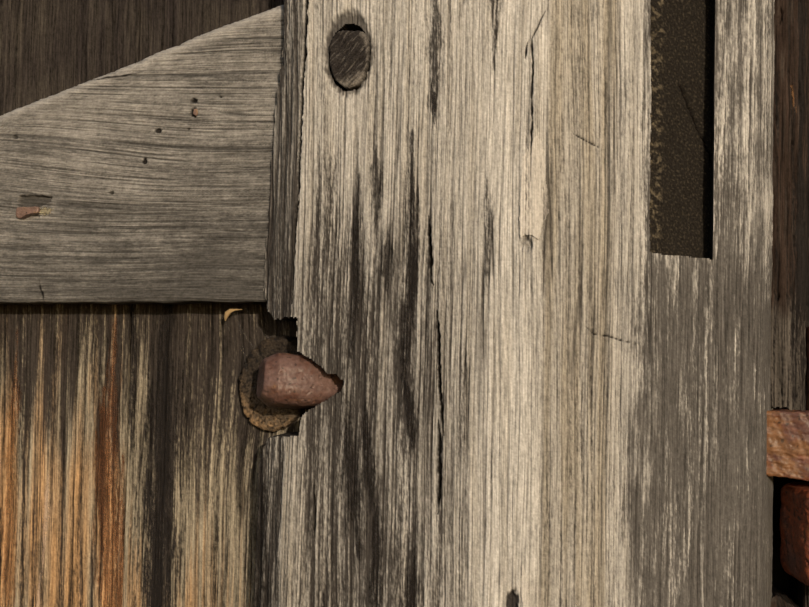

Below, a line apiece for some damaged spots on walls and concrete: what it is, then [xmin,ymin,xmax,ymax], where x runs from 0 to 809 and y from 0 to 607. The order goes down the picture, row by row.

crack [525,20,541,144]
crack [426,218,434,281]
crack [436,311,444,514]
water stain [36,475,50,607]